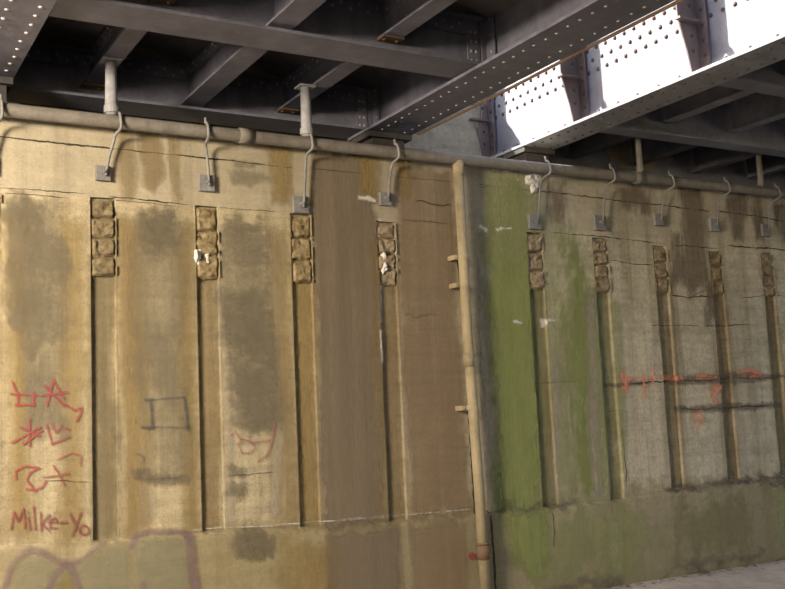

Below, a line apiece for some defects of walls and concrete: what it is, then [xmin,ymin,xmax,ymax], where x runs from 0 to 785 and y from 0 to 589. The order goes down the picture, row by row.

crack [0,136,271,166]
leakage [728,193,762,239]
crack [551,232,785,251]
crack [651,321,749,329]
leakage [12,197,82,536]
leakage [91,220,189,536]
leakage [530,290,559,504]